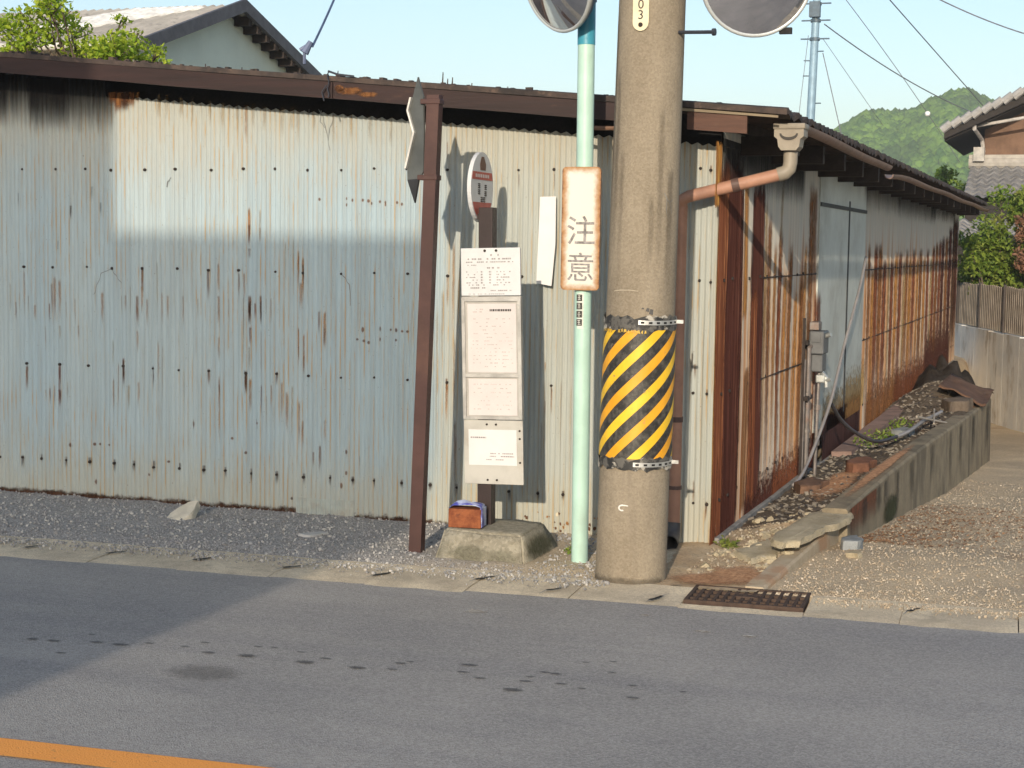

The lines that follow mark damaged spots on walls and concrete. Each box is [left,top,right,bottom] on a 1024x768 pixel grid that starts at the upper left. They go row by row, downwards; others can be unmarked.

rust [109,92,139,108]
rust [705,142,958,545]
rust [0,480,315,515]